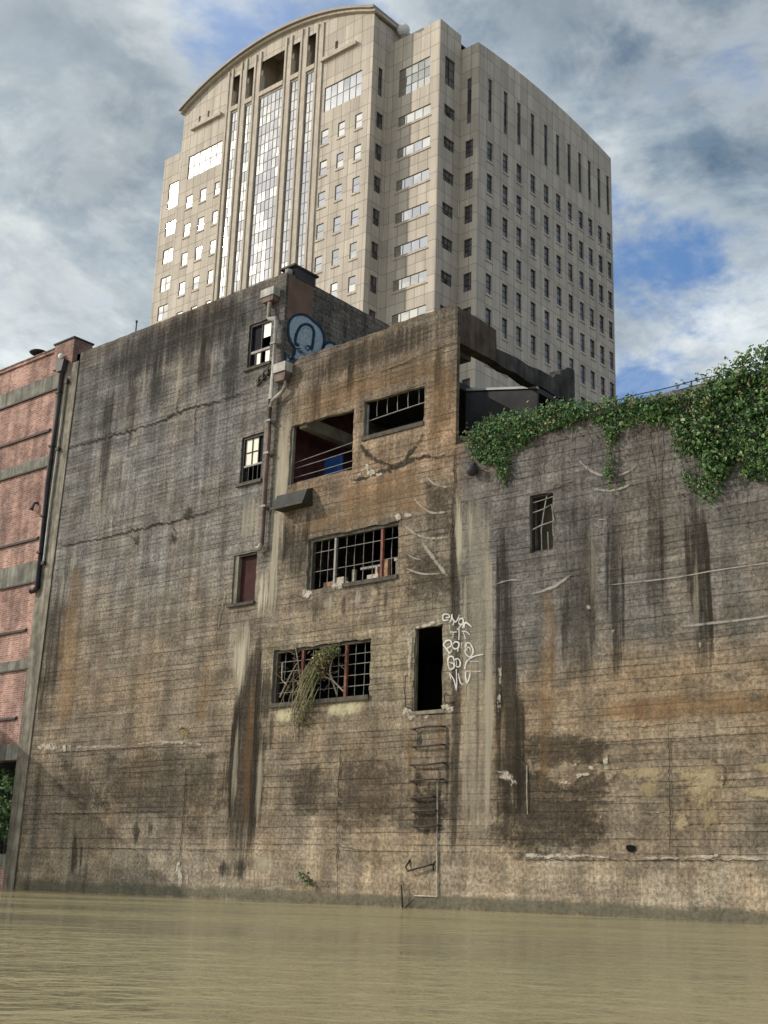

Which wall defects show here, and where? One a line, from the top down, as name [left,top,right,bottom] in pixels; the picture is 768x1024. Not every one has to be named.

crack [68,393,243,475]
spalling [353,433,445,481]
crack [62,474,234,610]
damp [232,625,247,689]
spalling [498,754,528,814]
spalling [526,845,768,862]